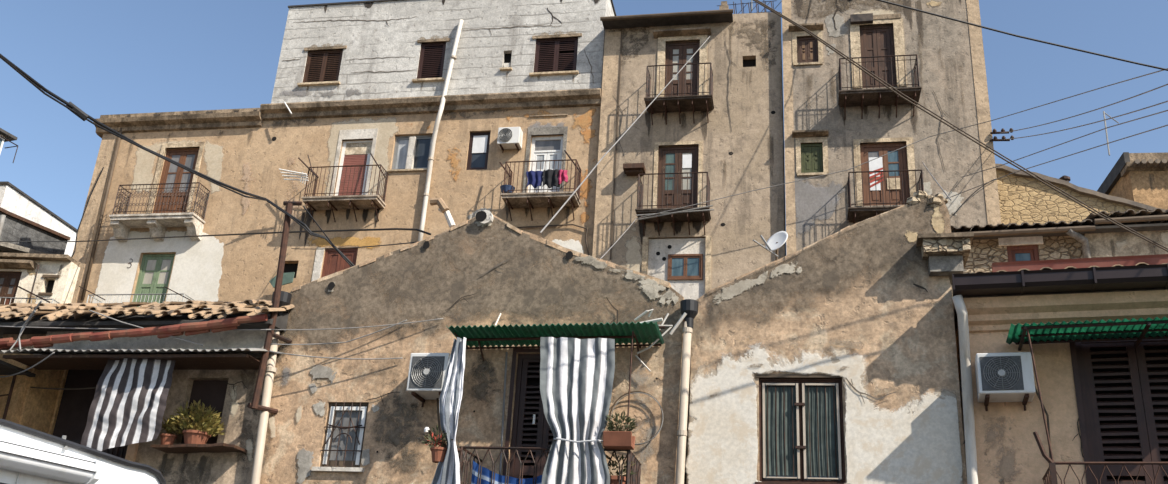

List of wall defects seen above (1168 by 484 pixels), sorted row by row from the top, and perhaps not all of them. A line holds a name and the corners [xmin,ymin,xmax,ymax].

crack [933,91,950,170]
flaking render [552,227,679,305]
peeling [685,336,963,484]